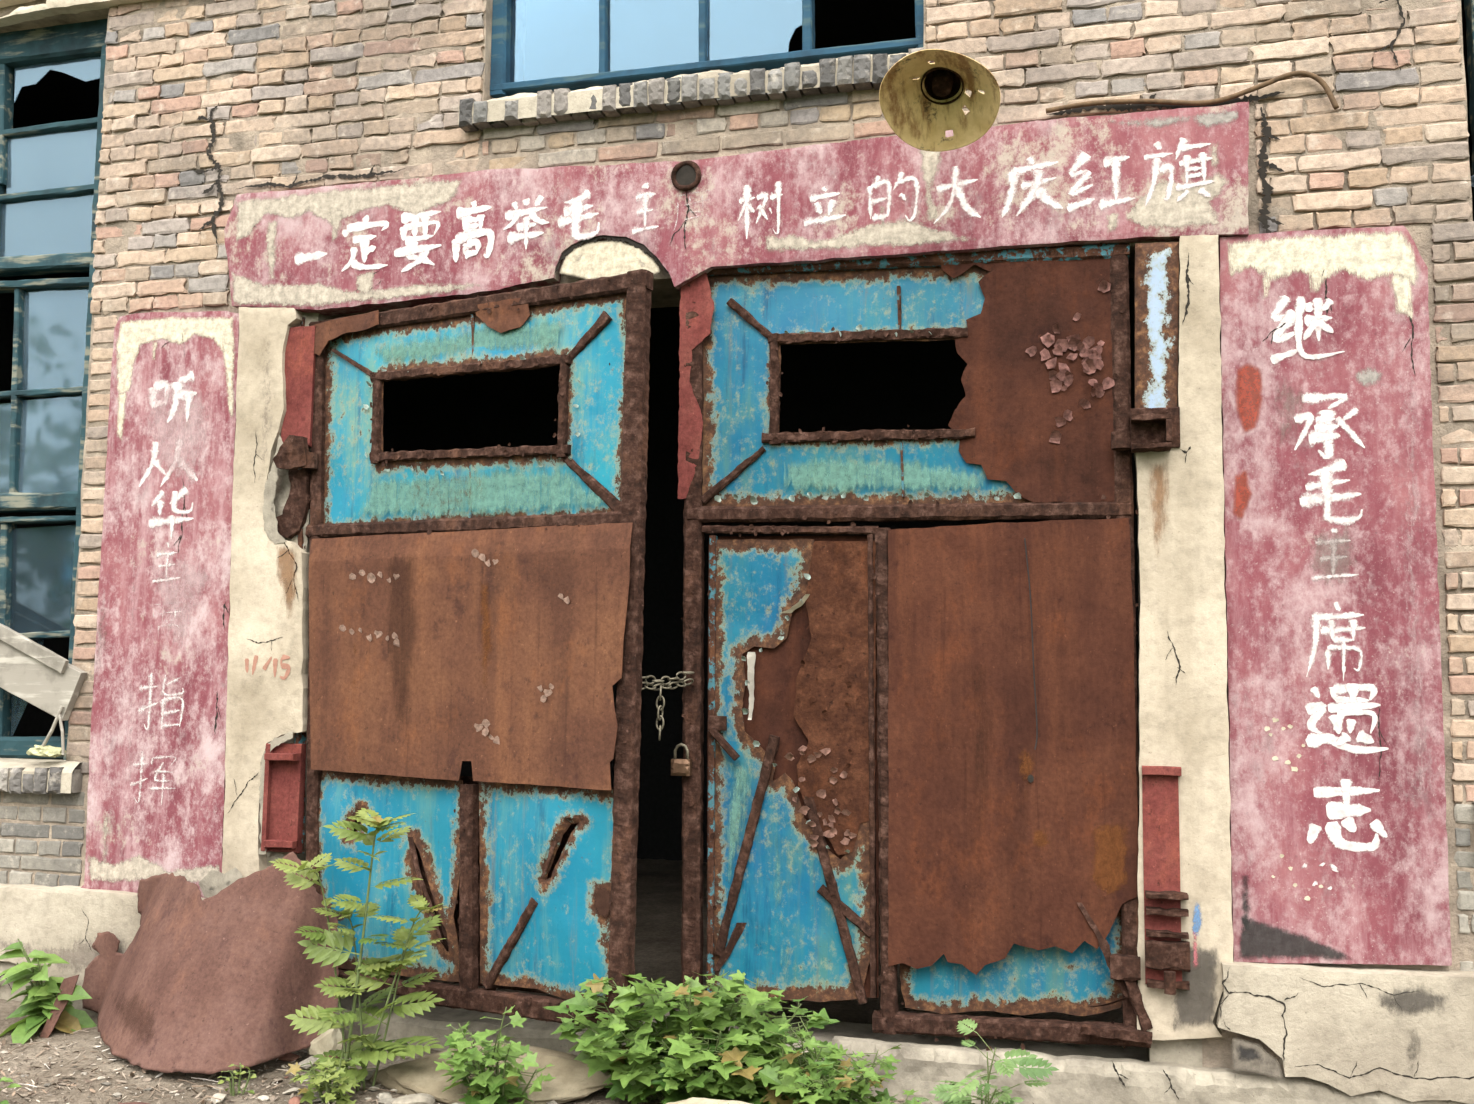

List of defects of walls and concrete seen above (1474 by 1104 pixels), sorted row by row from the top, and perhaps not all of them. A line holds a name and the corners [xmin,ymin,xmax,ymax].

peeling [1047,91,1417,318]
peeling [116,102,473,437]
rust [1025,313,1115,444]
rust [349,570,400,583]
rust [471,549,499,567]
rust [339,625,400,647]
rust [537,683,554,703]
rust [474,719,500,745]
rust [1093,826,1127,892]
crack [1219,972,1474,1080]